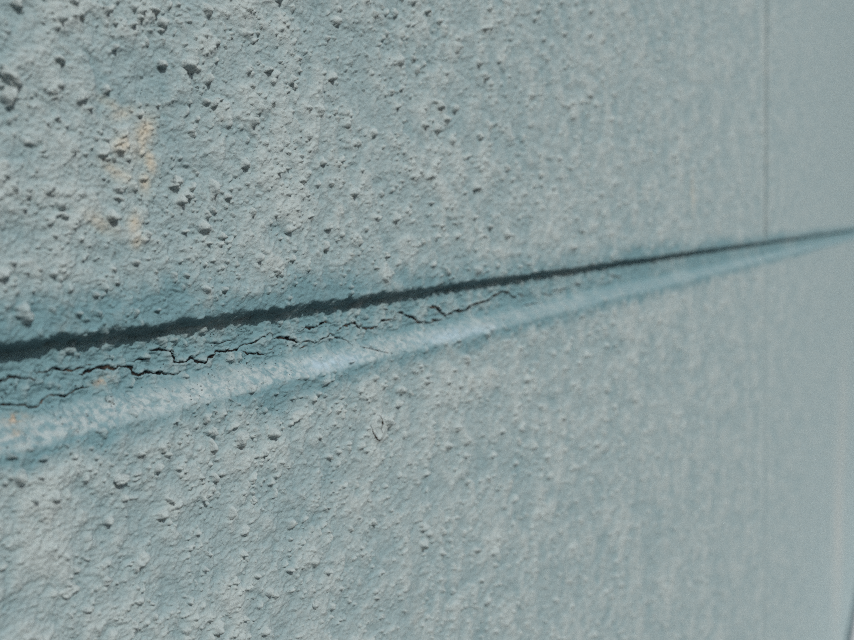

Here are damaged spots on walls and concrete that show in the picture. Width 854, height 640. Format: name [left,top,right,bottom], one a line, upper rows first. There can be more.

crack [0,283,580,408]